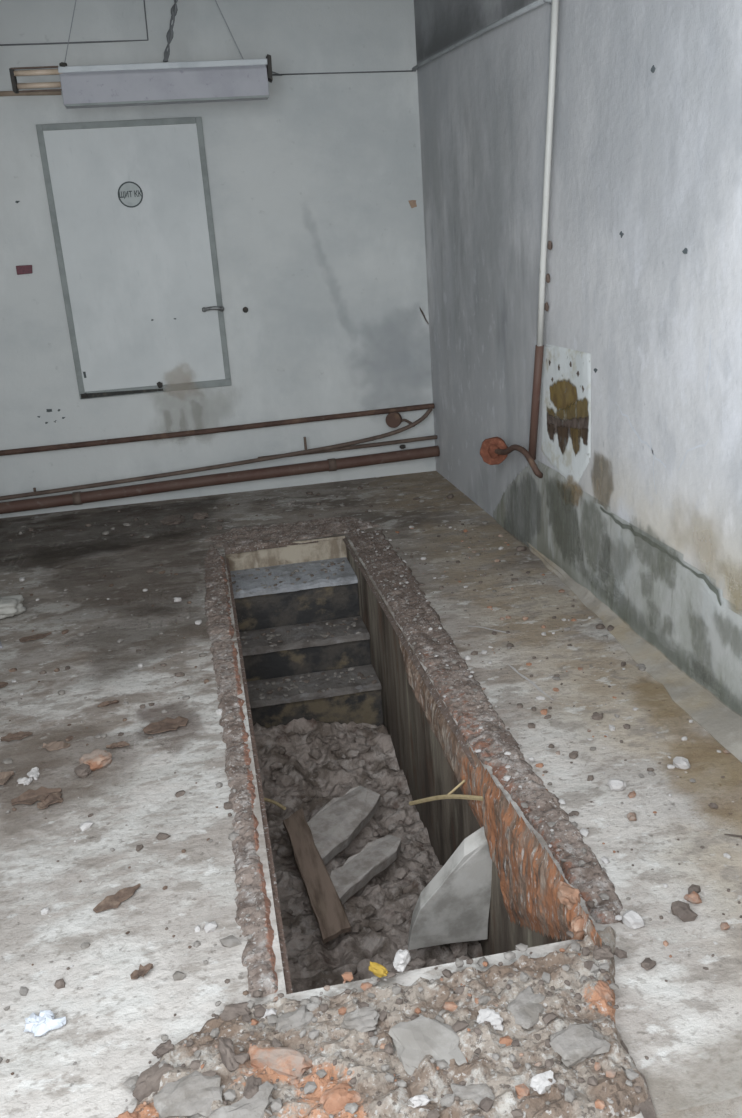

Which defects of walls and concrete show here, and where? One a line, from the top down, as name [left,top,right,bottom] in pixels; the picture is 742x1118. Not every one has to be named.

water stain [592,456,612,506]
spalling [115,516,652,1118]